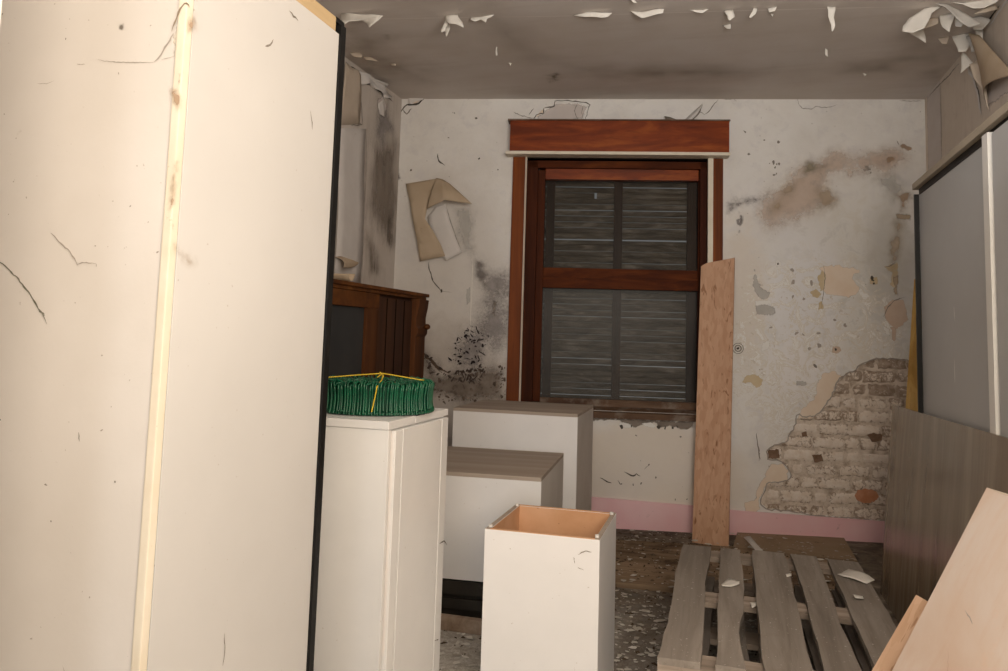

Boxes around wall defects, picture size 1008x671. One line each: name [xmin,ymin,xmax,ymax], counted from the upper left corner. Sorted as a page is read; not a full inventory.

peeling [340,13,383,27]
peeling [441,15,493,37]
peeling [631,0,664,18]
peeling [723,10,735,29]
peeling [827,7,835,31]
flaking render [902,0,998,111]
leakage [372,110,395,243]
flaking render [753,275,775,315]
flaking render [775,260,860,309]
leakage [424,262,508,404]
flaking render [593,418,693,429]
flaking render [742,357,909,521]